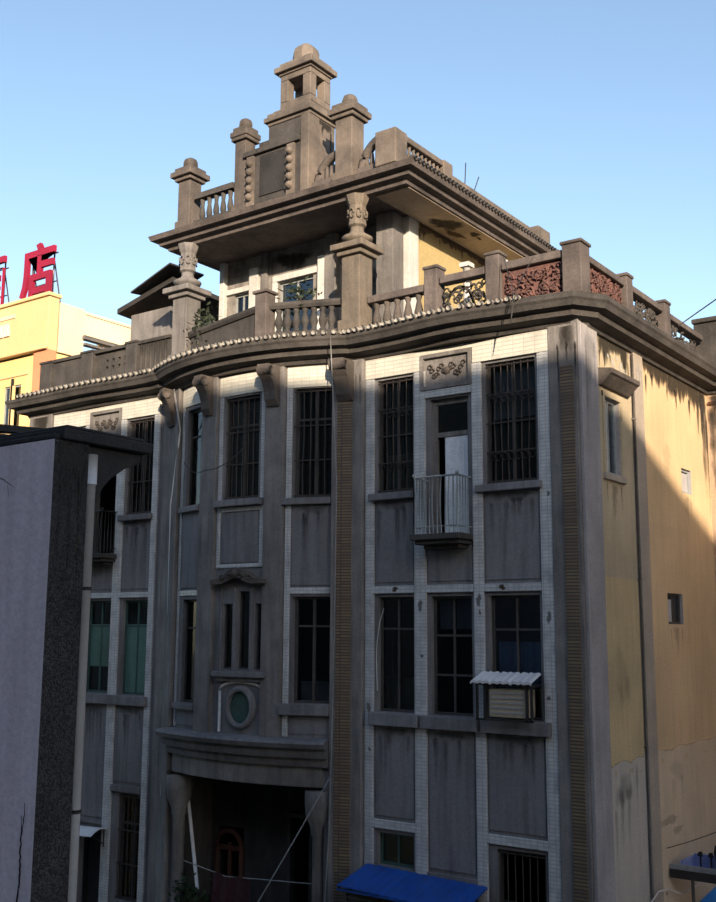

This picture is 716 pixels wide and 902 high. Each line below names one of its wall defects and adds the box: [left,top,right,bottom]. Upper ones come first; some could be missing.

leakage [419,219,485,266]
leakage [599,336,629,375]
leakage [642,360,716,464]